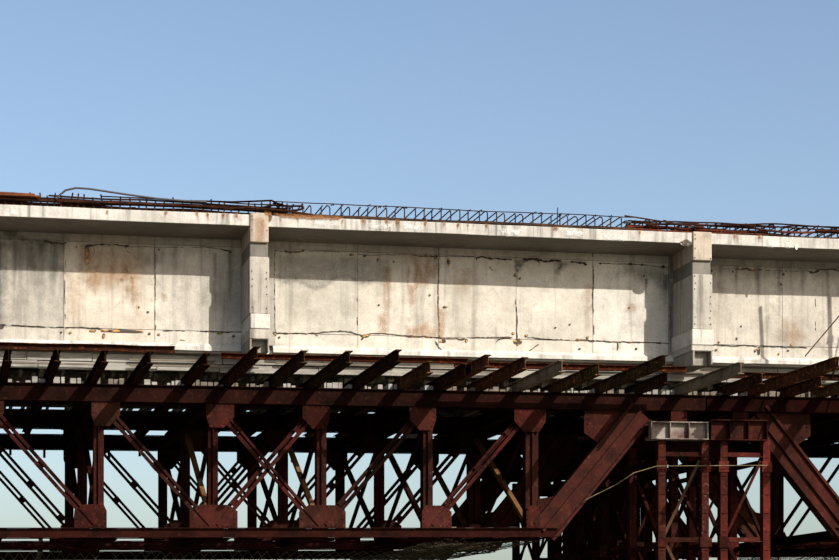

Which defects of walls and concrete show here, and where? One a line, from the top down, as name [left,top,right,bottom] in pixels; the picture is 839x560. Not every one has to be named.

crack [274,247,671,350]